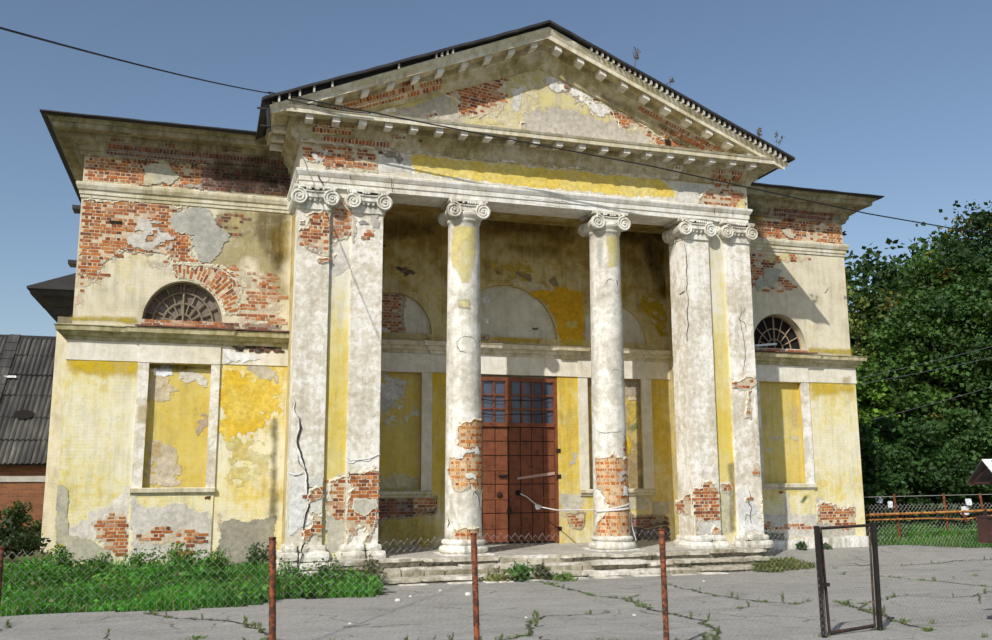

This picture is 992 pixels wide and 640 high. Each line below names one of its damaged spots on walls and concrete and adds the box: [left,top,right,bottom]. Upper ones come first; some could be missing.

flaking render [519,76,724,152]
flaking render [83,138,291,196]
flaking render [300,122,747,208]
flaking render [74,198,288,330]
flaking render [298,196,380,279]
flaking render [750,250,811,293]
peeling [68,485,212,563]
crack [287,398,312,568]
flaking render [301,465,438,545]
flaking render [447,417,483,493]
flaking render [560,440,734,537]
flaking render [744,491,856,539]